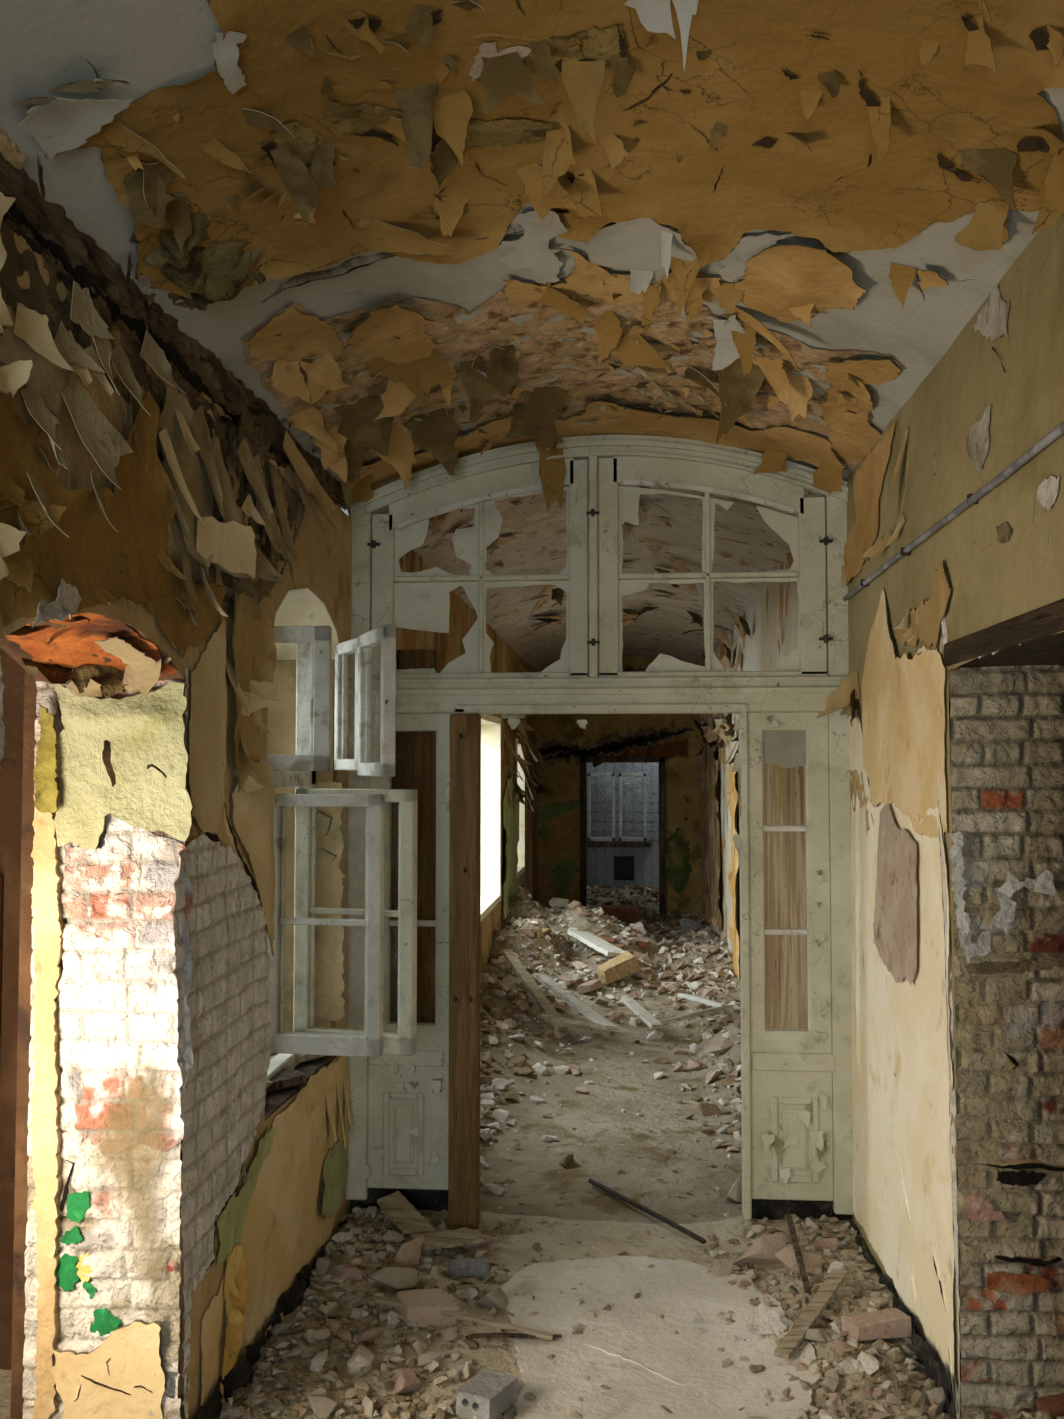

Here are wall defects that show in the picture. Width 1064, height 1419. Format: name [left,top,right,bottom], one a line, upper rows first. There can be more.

peeling [13,0,1064,587]
spalling [0,152,352,1419]
peeling [501,714,549,919]
peeling [526,580,566,630]
spalling [531,898,581,920]
crack [538,725,694,768]
peeling [665,713,744,979]
peeling [682,610,751,671]
peeling [763,762,829,1044]
peeling [817,560,1064,1419]
crack [939,615,947,653]
crack [900,727,1064,1419]